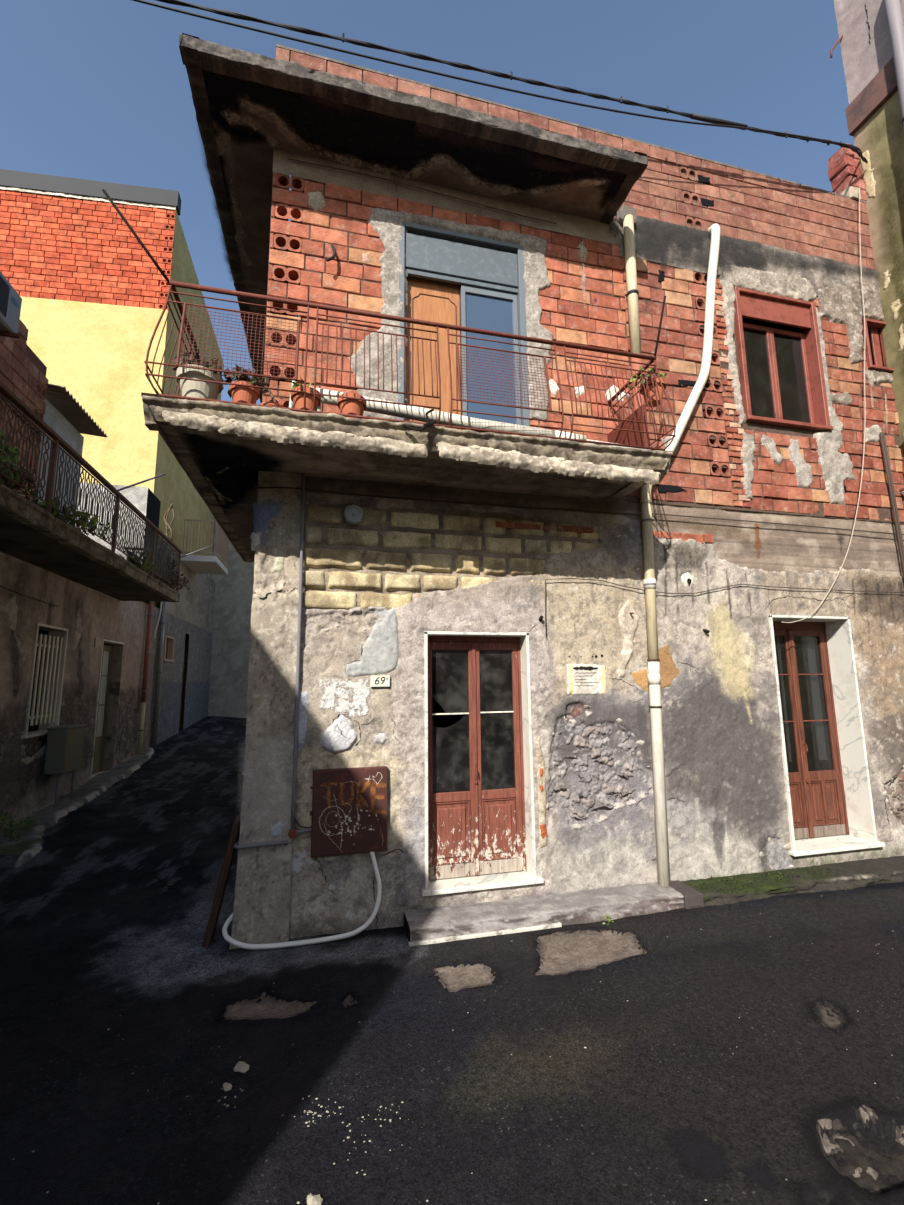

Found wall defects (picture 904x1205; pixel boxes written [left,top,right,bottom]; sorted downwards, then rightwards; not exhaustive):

spalling [162,410,686,494]
leakage [665,545,704,592]
spalling [301,606,382,649]
spalling [534,703,653,848]
leakage [668,595,780,880]
spalling [882,765,904,825]